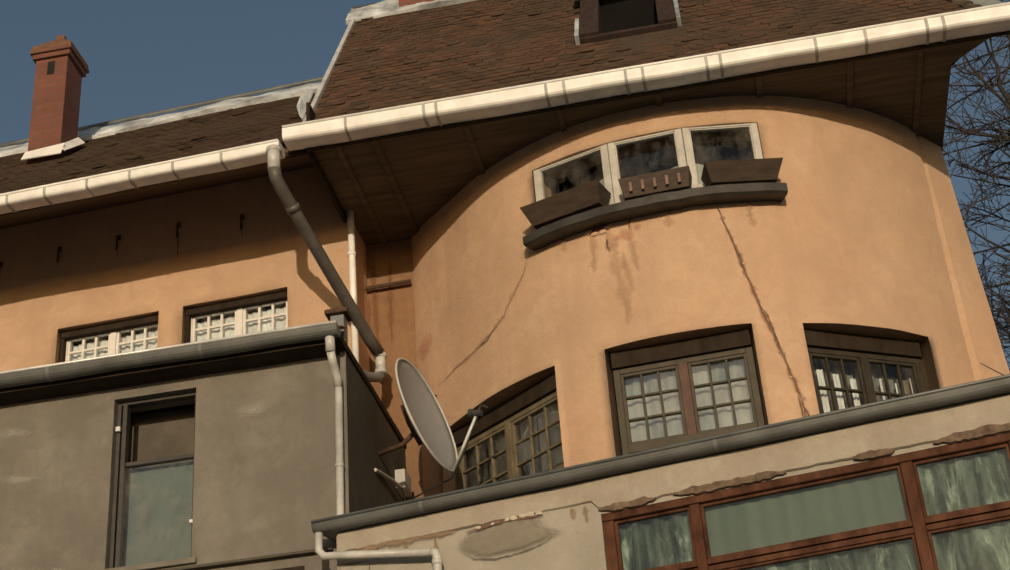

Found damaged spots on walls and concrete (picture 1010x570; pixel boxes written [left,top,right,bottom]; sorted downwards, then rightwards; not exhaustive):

crack [438,250,530,386]
crack [716,204,810,417]
flaking render [673,471,787,496]
flaking render [933,423,1010,445]